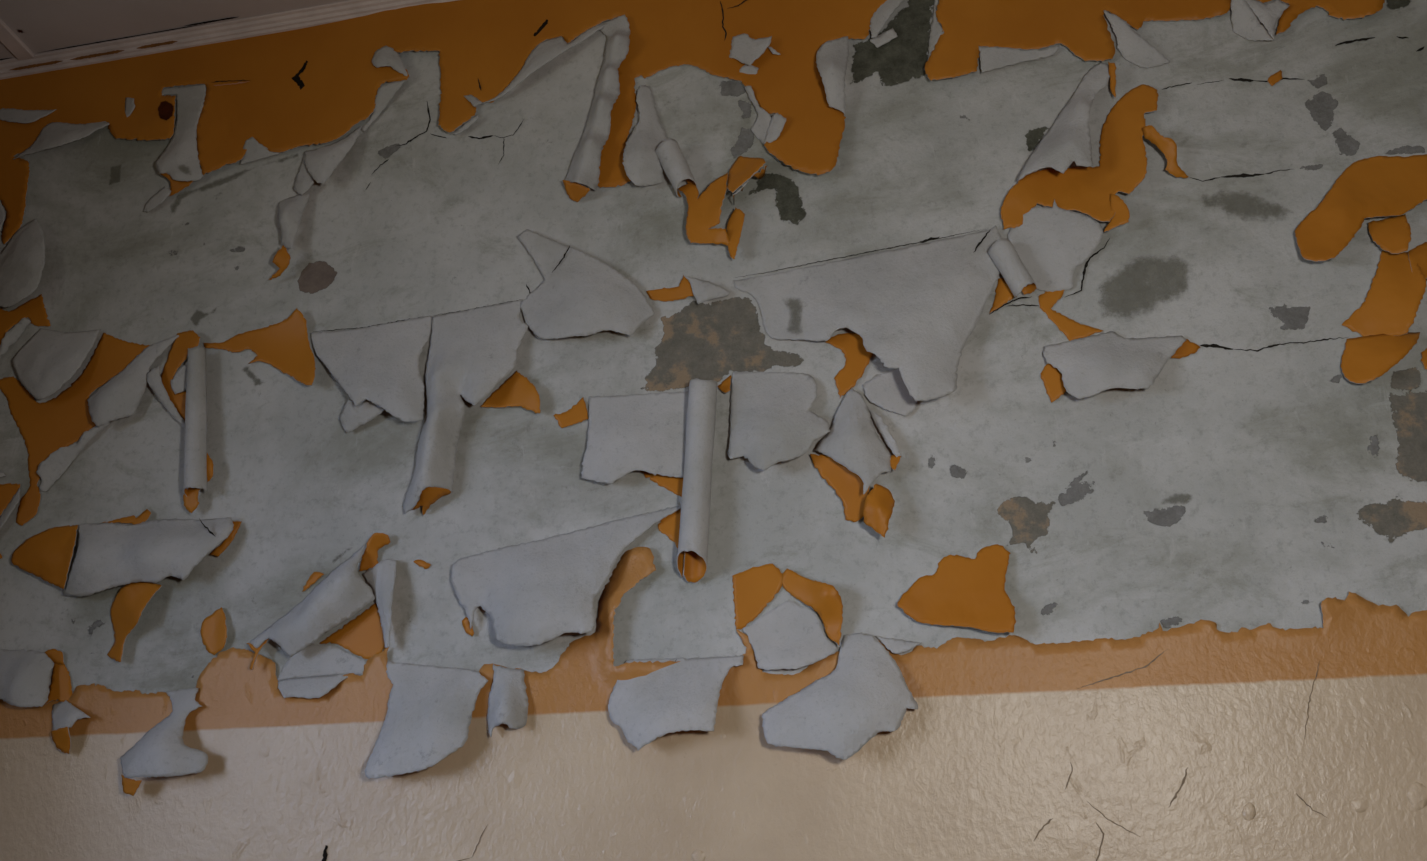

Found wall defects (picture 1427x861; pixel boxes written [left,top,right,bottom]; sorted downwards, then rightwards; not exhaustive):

peeling [1231,0,1290,41]
peeling [143,84,206,213]
peeling [268,46,411,280]
peeling [0,202,101,399]
peeling [311,0,1200,646]
peeling [1295,74,1427,482]
peeling [11,310,242,662]
spalling [1357,496,1427,542]
peeling [0,649,91,754]
peeling [120,676,208,796]
peeling [247,532,529,779]
peeling [608,601,921,760]